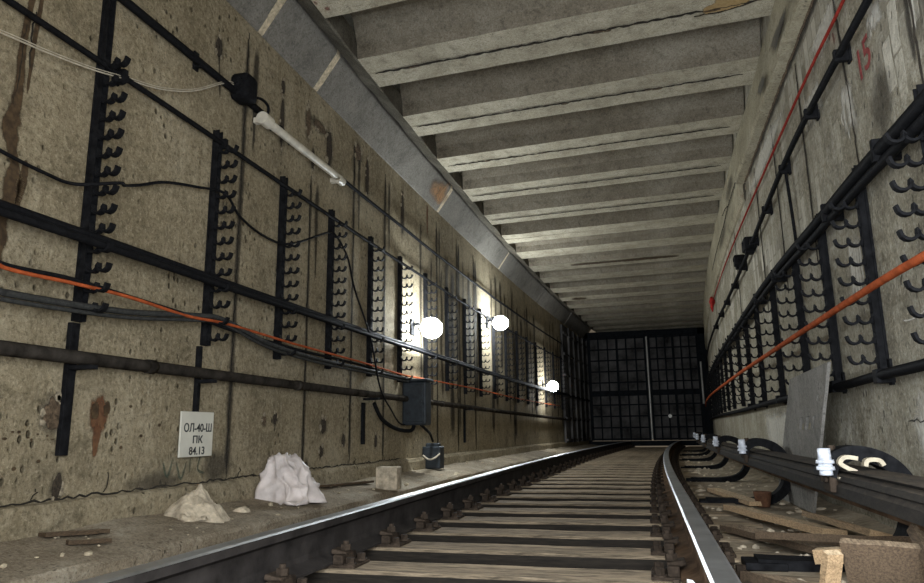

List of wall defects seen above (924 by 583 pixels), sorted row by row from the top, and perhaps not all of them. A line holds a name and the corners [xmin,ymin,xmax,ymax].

spalling [694,0,757,17]
damp [1,0,44,206]
damp [0,216,8,270]
rust [90,395,111,457]